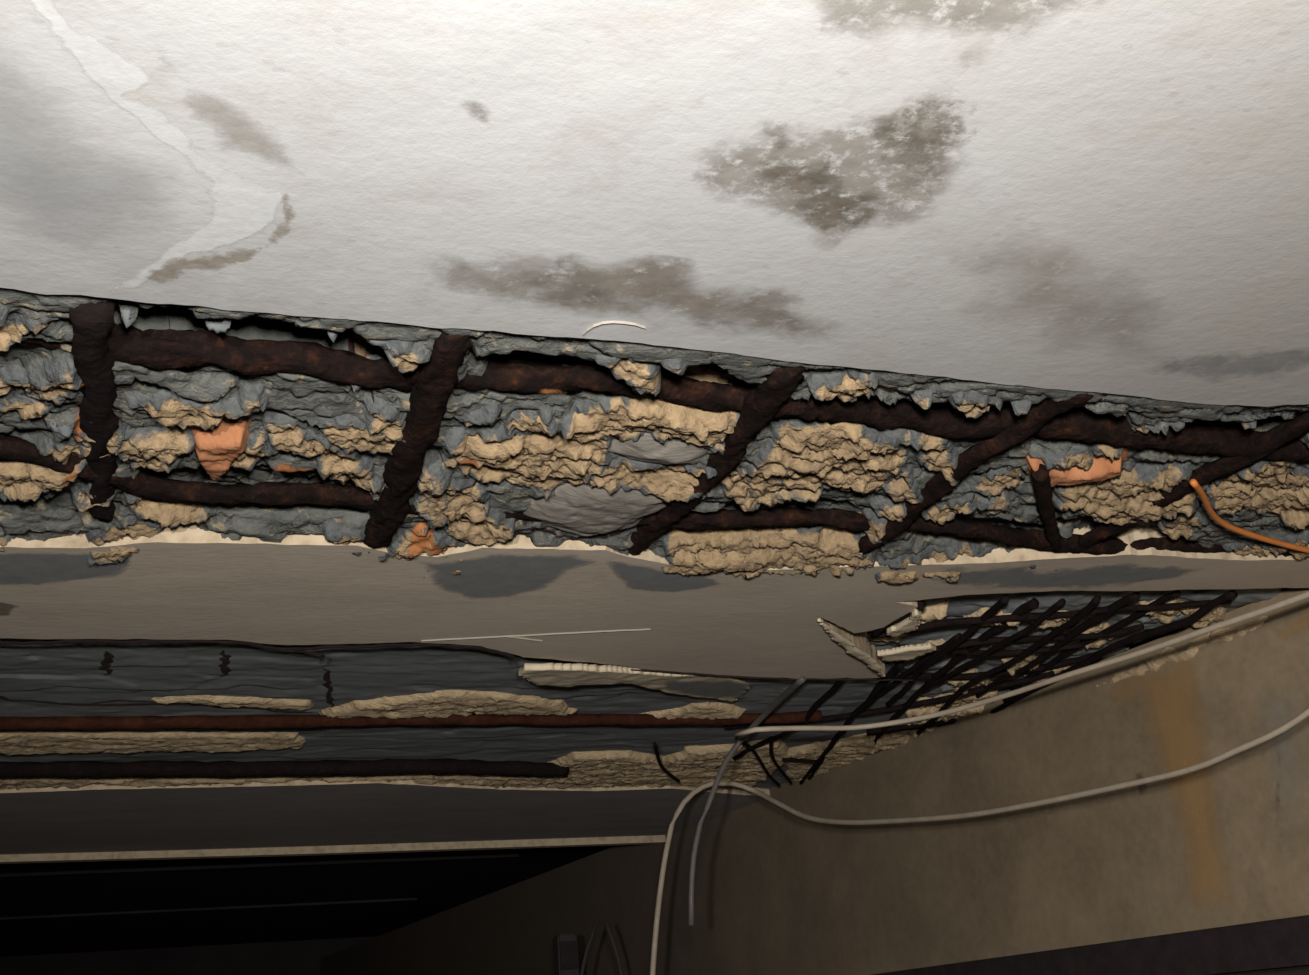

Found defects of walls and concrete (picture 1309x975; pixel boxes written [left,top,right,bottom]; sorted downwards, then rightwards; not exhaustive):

leakage [831,0,1019,23]
leakage [31,0,293,289]
leakage [707,101,961,233]
leakage [455,261,804,330]
rust [272,464,312,473]
rust [408,521,443,557]
spalling [0,288,1309,792]
leakage [430,556,586,597]
leakage [613,562,717,591]